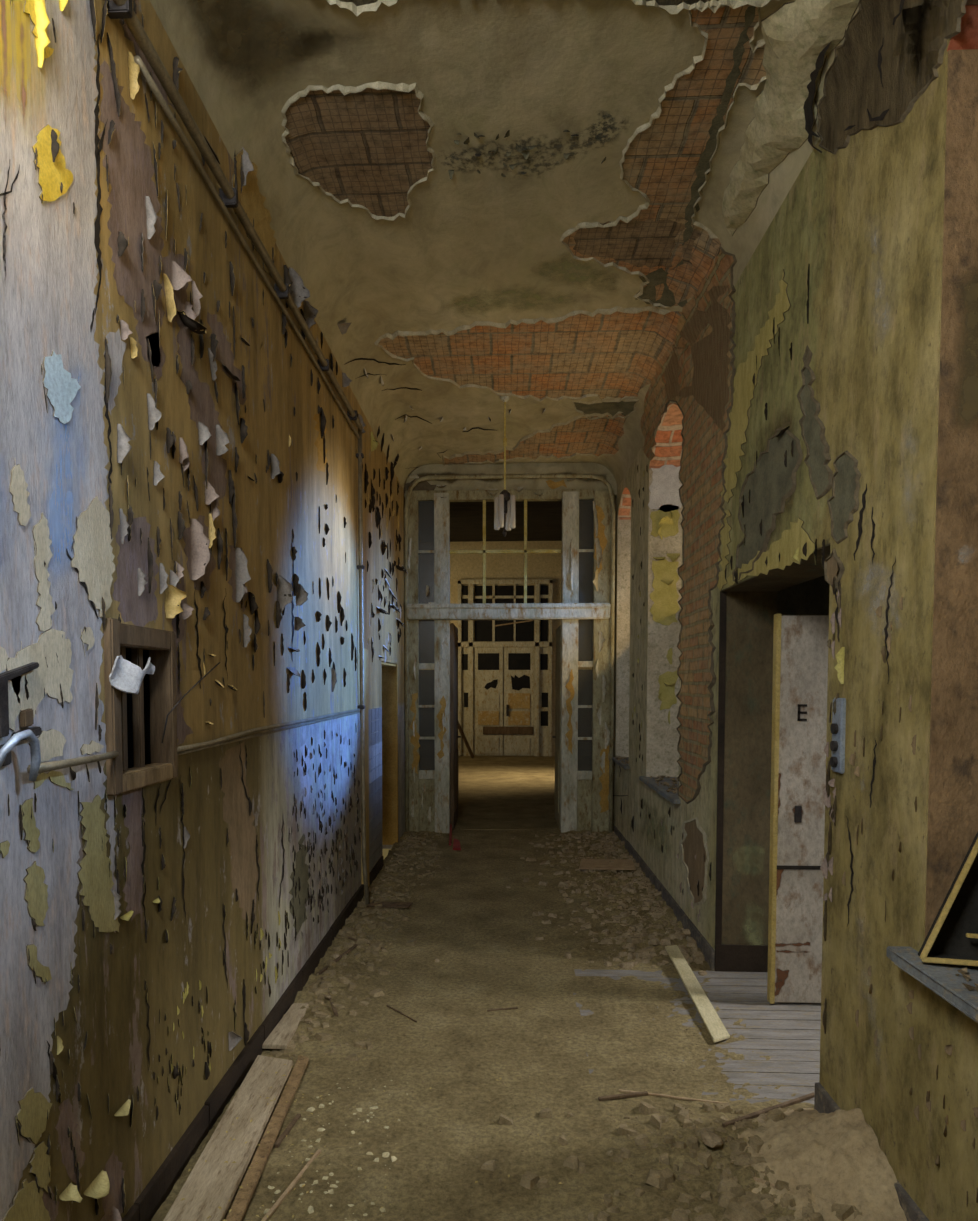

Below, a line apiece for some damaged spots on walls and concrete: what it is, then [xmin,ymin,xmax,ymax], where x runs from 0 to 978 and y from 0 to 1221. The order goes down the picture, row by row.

crack [0,159,20,279]
peeling [0,0,447,1221]
flaking render [631,798,711,922]
peeling [820,742,846,941]